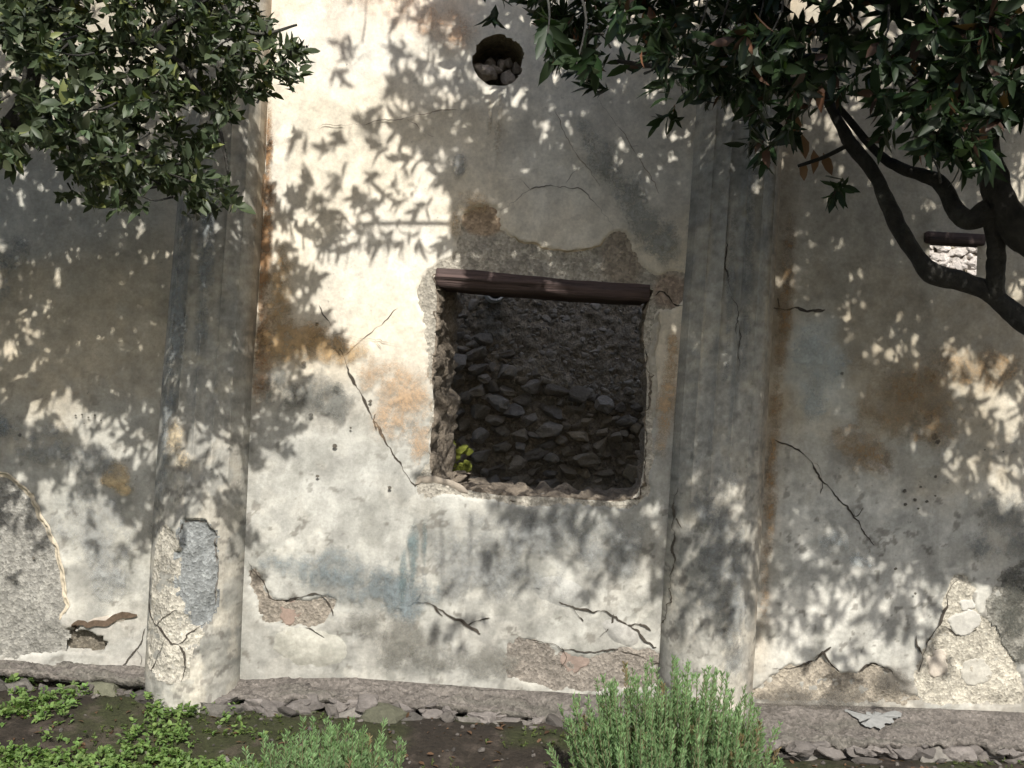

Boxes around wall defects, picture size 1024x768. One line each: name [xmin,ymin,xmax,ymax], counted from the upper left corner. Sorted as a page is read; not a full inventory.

crack [317,109,455,137]
crack [318,306,418,488]
spalling [415,205,685,509]
spalling [0,472,71,660]
spalling [146,518,220,684]
spalling [249,569,336,628]
crack [393,594,489,634]
crack [519,490,682,667]
crack [775,440,874,545]
spalling [752,560,1024,730]